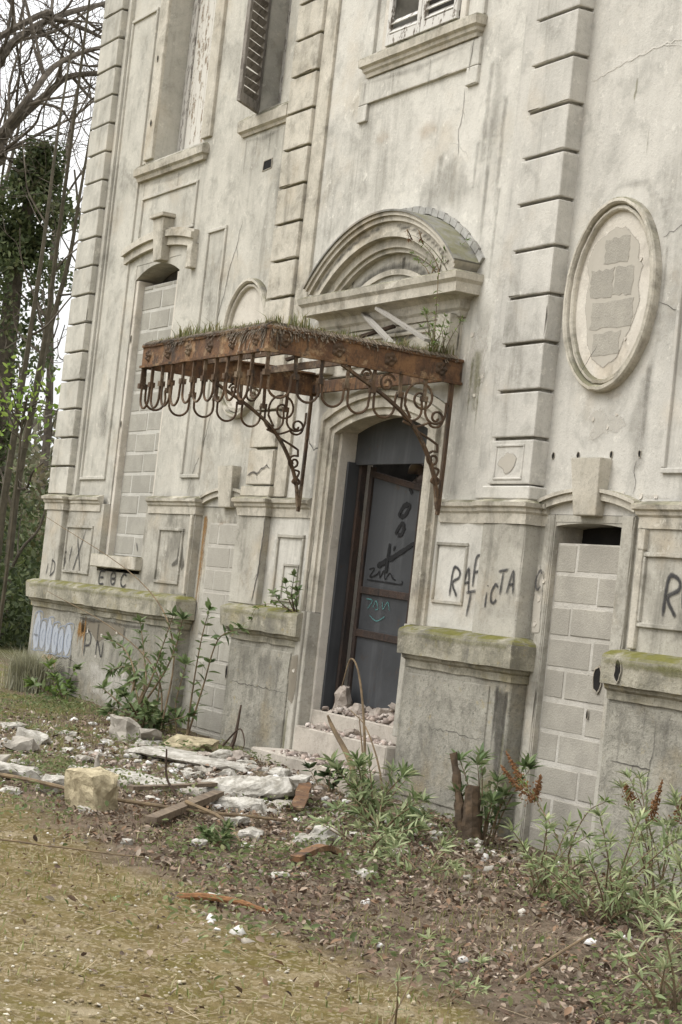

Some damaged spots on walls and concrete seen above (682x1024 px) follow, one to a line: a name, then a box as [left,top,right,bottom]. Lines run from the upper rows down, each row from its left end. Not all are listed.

spalling [585,227,643,368]
corrosion [195,516,207,600]